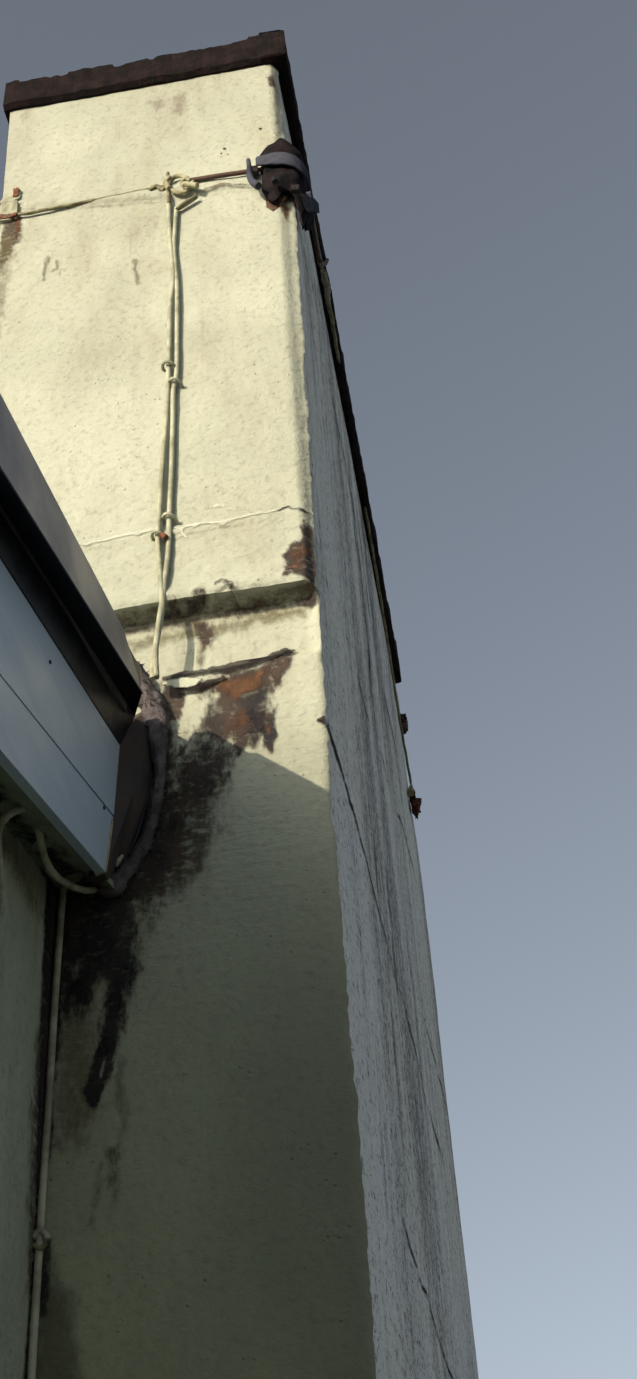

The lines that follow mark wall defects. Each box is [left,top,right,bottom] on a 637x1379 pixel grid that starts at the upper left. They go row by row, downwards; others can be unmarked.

damp [118,579,327,634]
crack [357,642,371,720]
crack [317,716,448,1164]
damp [3,732,189,1379]
crack [405,1226,454,1379]